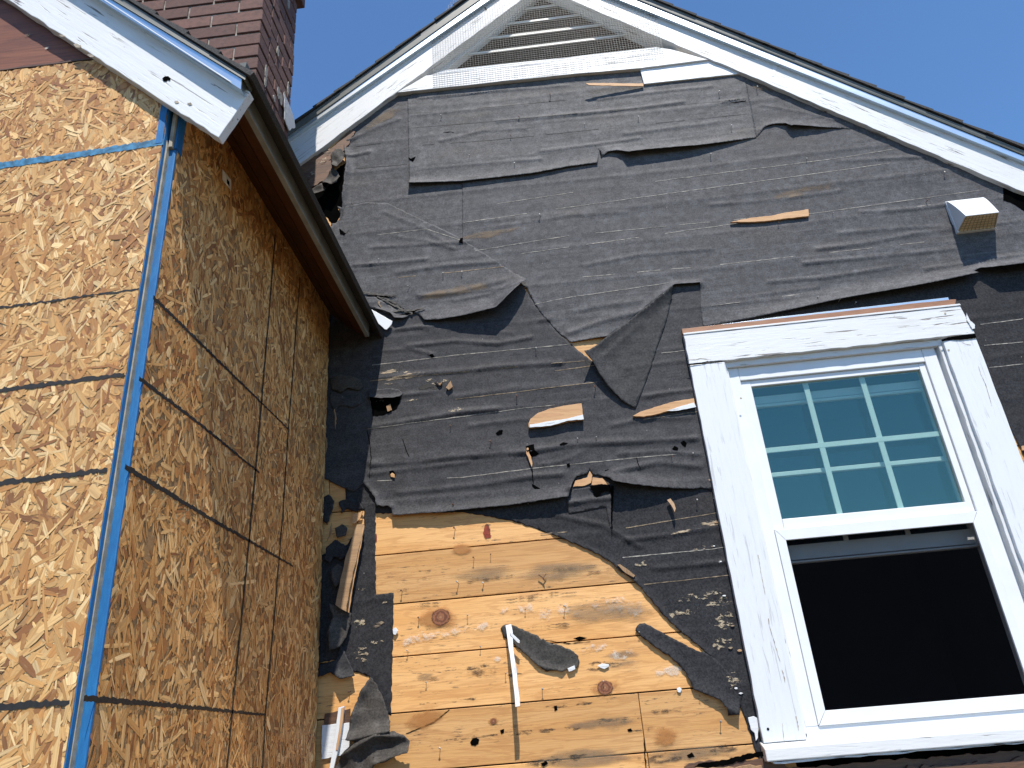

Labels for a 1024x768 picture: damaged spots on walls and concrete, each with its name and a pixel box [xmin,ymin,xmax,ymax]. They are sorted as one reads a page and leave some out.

peeling [381,369,453,401]
peeling [355,620,398,662]
peeling [670,592,742,652]
peeling [748,716,759,740]